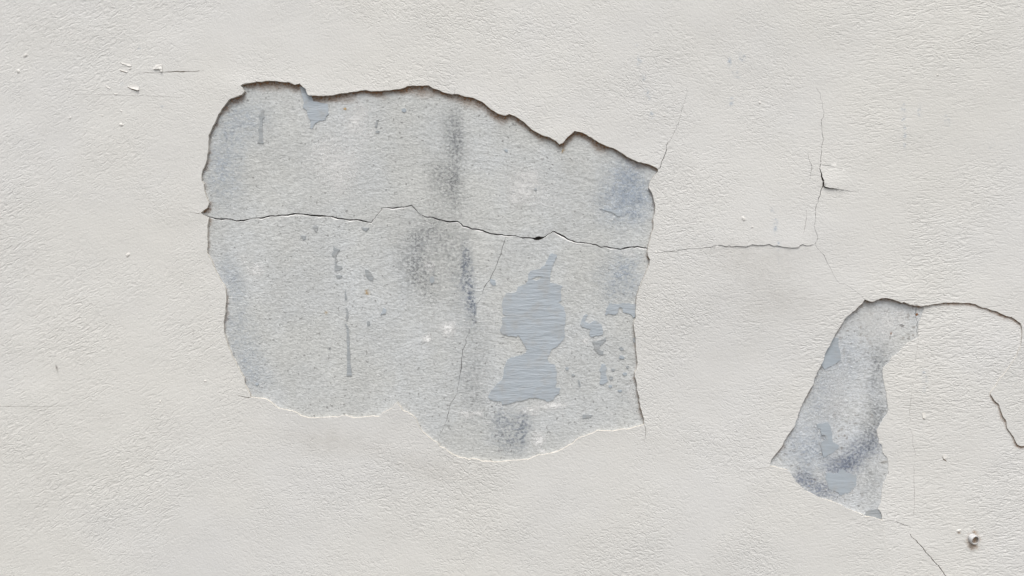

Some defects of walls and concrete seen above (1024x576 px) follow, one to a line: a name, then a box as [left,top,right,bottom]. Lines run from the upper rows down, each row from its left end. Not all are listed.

peeling [201,81,658,462]
crack [193,95,847,436]
peeling [769,298,1024,576]